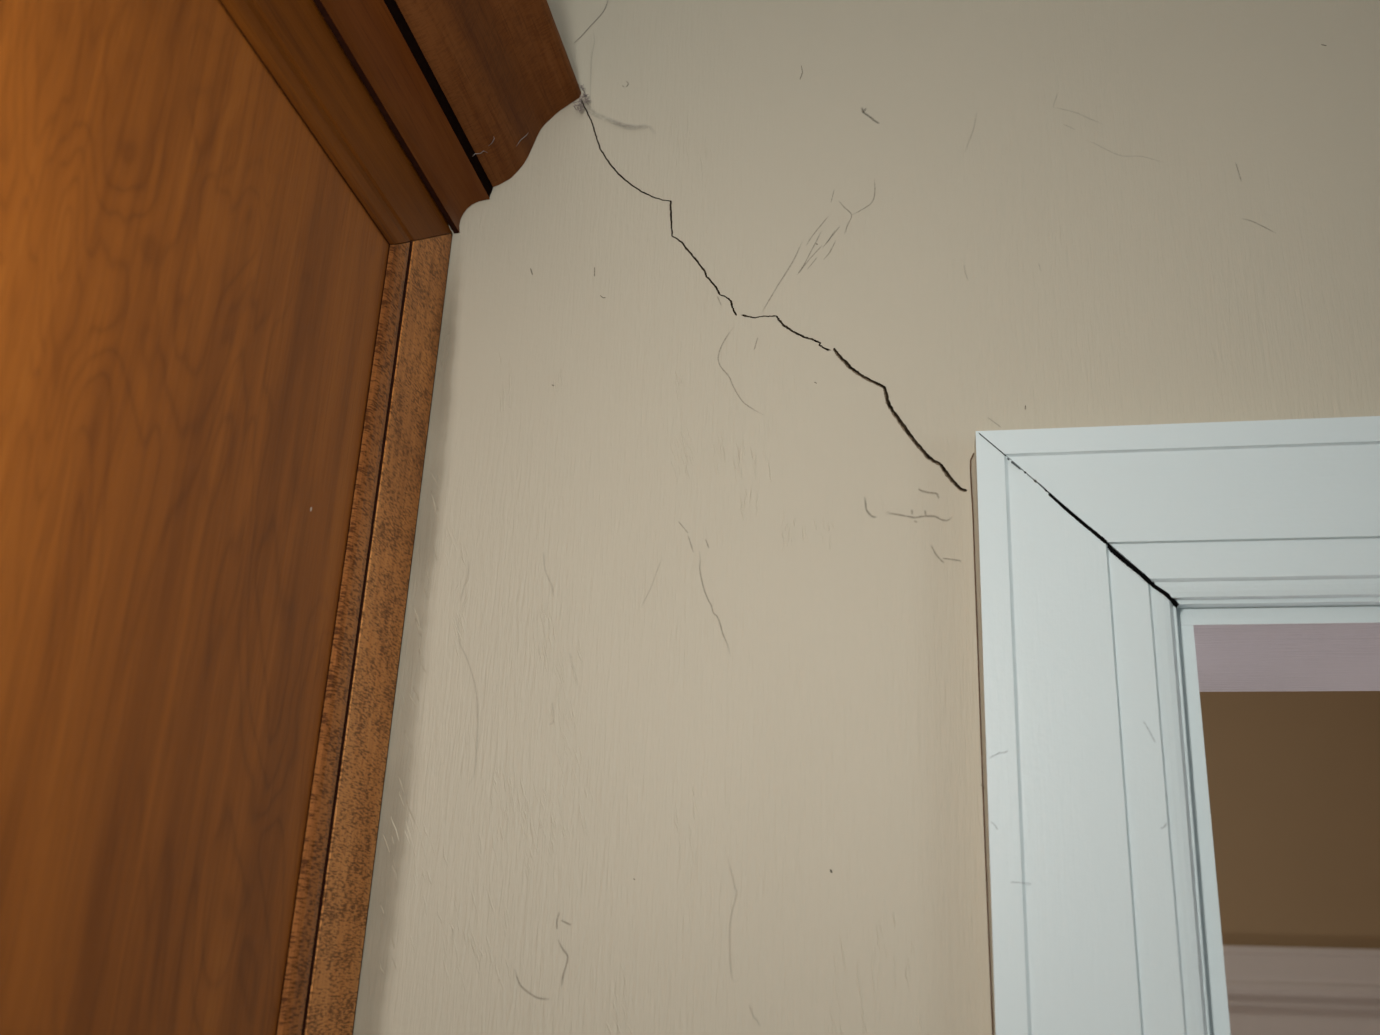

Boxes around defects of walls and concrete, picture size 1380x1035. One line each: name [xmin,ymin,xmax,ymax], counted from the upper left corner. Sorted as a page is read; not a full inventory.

crack [580,99,967,492]